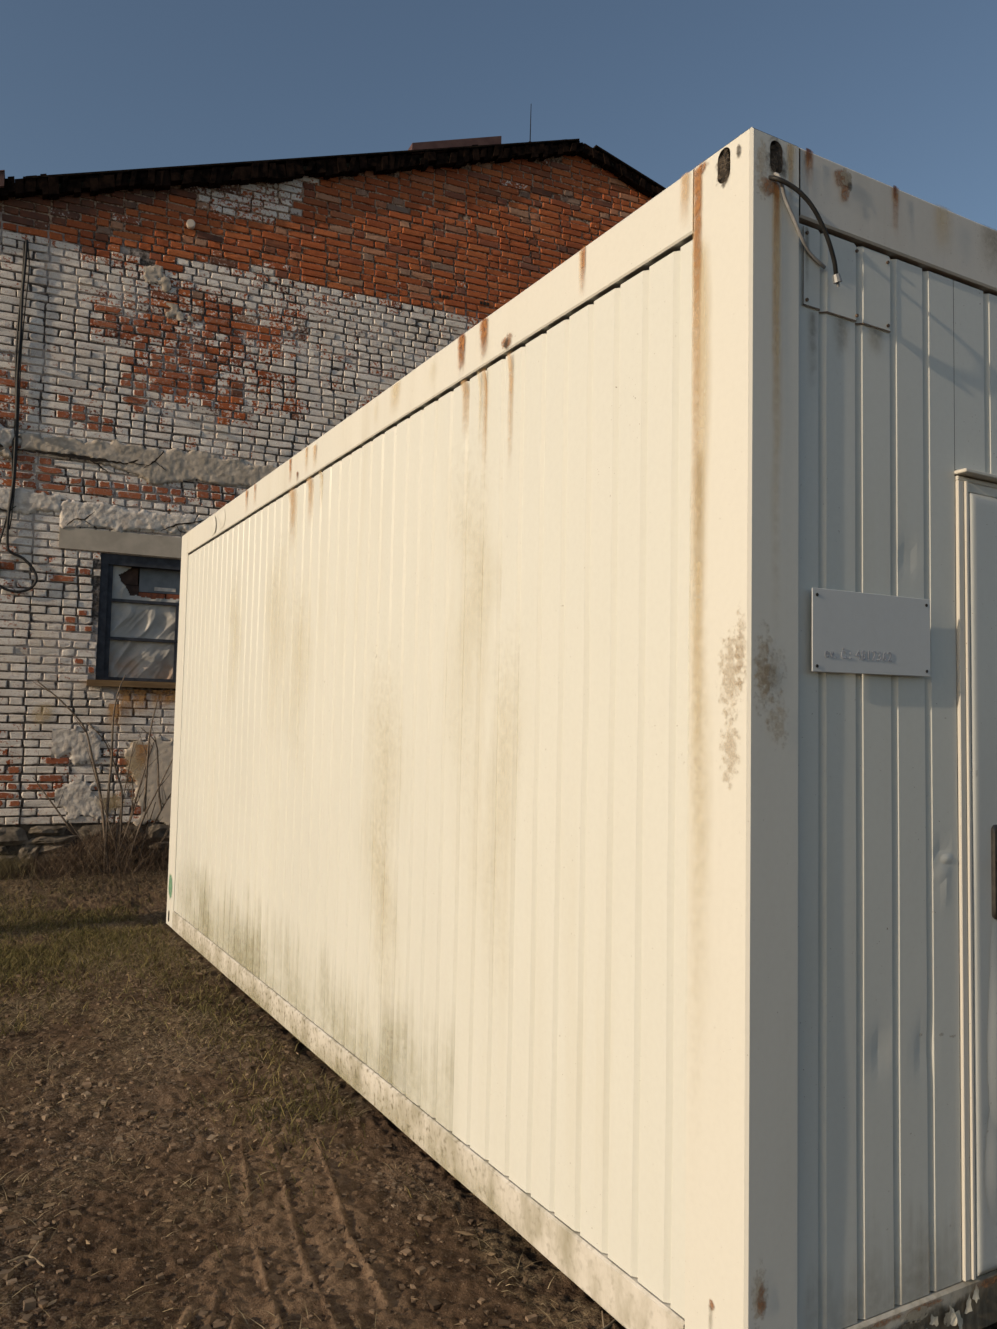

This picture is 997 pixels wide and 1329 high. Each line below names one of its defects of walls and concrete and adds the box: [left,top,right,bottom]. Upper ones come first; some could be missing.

corrosion [764,143,813,296]
corrosion [835,168,852,201]
peeling [93,265,231,412]
peeling [57,395,113,432]
crack [18,449,165,472]
peeling [0,411,235,507]
crack [161,514,206,533]
spalling [0,724,106,821]
spalling [119,736,174,826]
peeling [901,1284,980,1329]